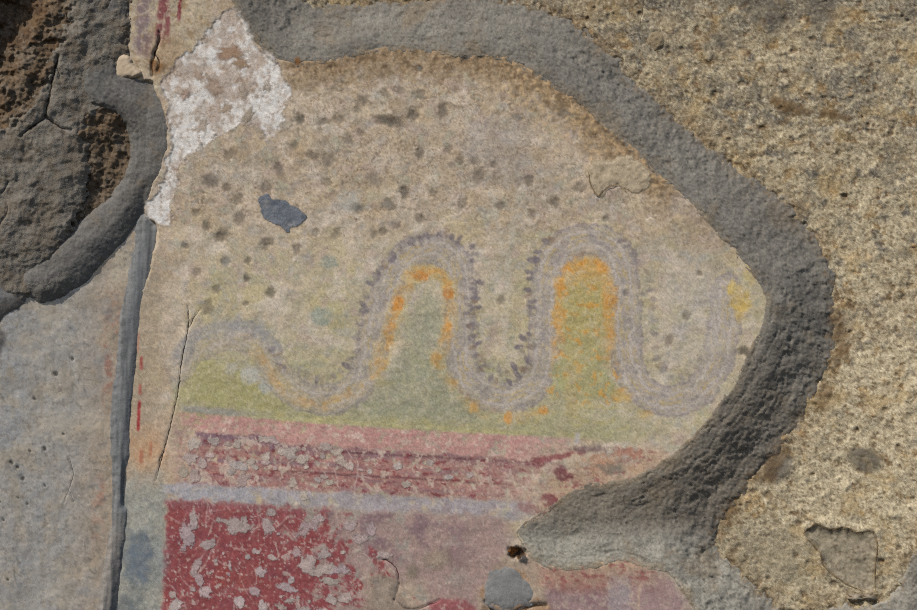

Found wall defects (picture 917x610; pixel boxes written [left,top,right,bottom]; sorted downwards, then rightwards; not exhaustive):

flaking render [116,55,142,79]
crack [22,58,69,135]
flaking render [585,155,651,197]
crack [156,312,198,478]
peeling [227,435,373,488]
peeling [216,516,251,535]
peeling [261,508,280,535]
peeling [295,514,325,538]
peeling [169,591,185,610]
peeling [178,511,231,598]
peeling [233,548,353,610]
flaking render [803,523,878,592]